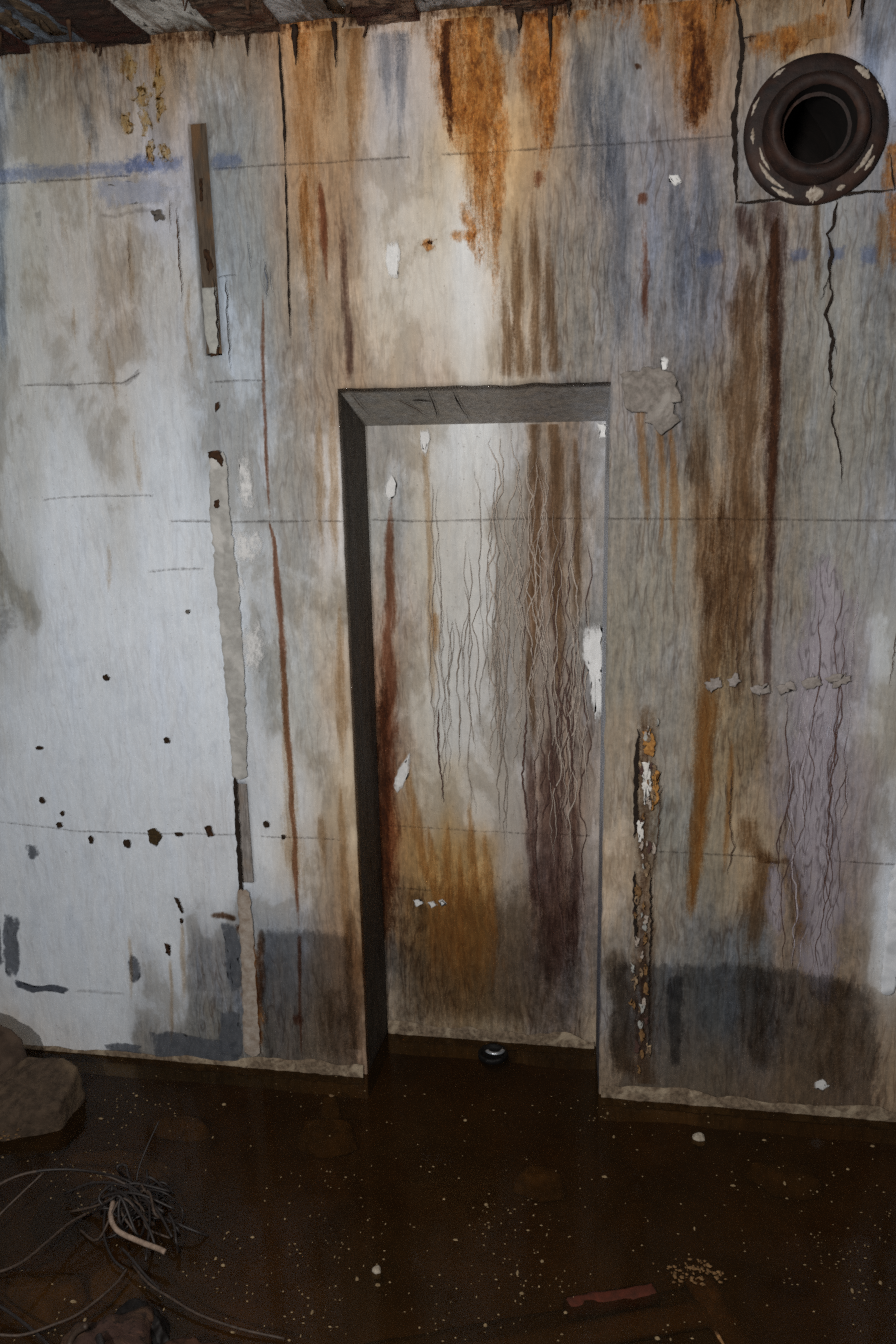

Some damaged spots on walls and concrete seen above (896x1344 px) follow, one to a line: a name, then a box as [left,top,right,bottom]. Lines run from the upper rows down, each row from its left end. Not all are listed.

corrosion [441,21,451,131]
corrosion [690,29,706,117]
crack [730,0,781,204]
corrosion [768,223,780,513]
crack [822,153,895,479]
spalling [628,719,663,1074]
peeling [881,864,896,995]
water stain [601,1085,896,1122]